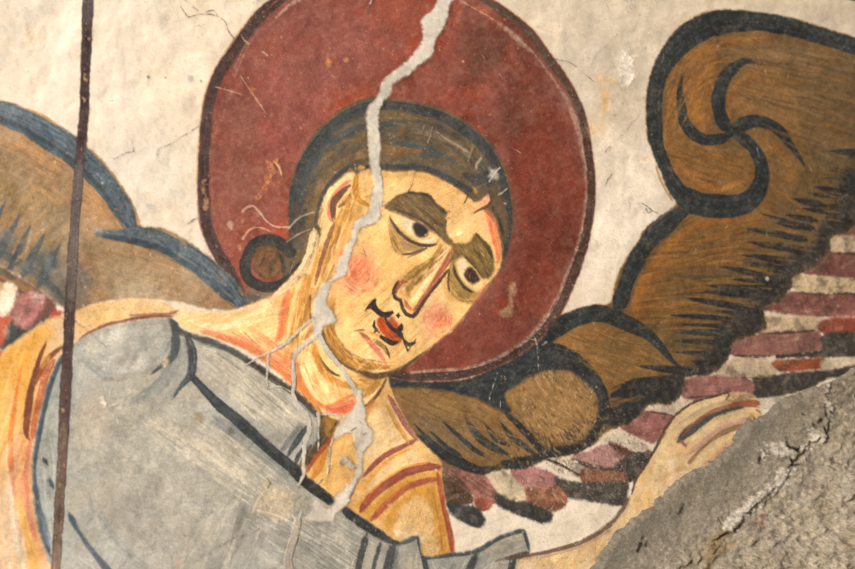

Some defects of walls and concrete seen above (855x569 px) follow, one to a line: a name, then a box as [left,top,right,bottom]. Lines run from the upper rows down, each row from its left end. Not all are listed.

crack [244,0,456,569]